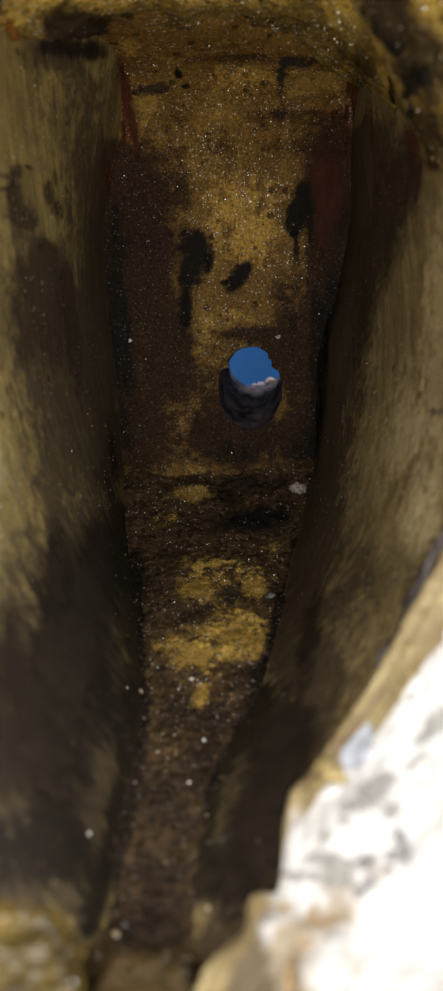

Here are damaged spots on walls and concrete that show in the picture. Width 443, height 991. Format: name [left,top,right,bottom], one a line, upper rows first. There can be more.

leakage [284,179,319,259]
leakage [177,225,214,329]
leakage [220,262,252,293]